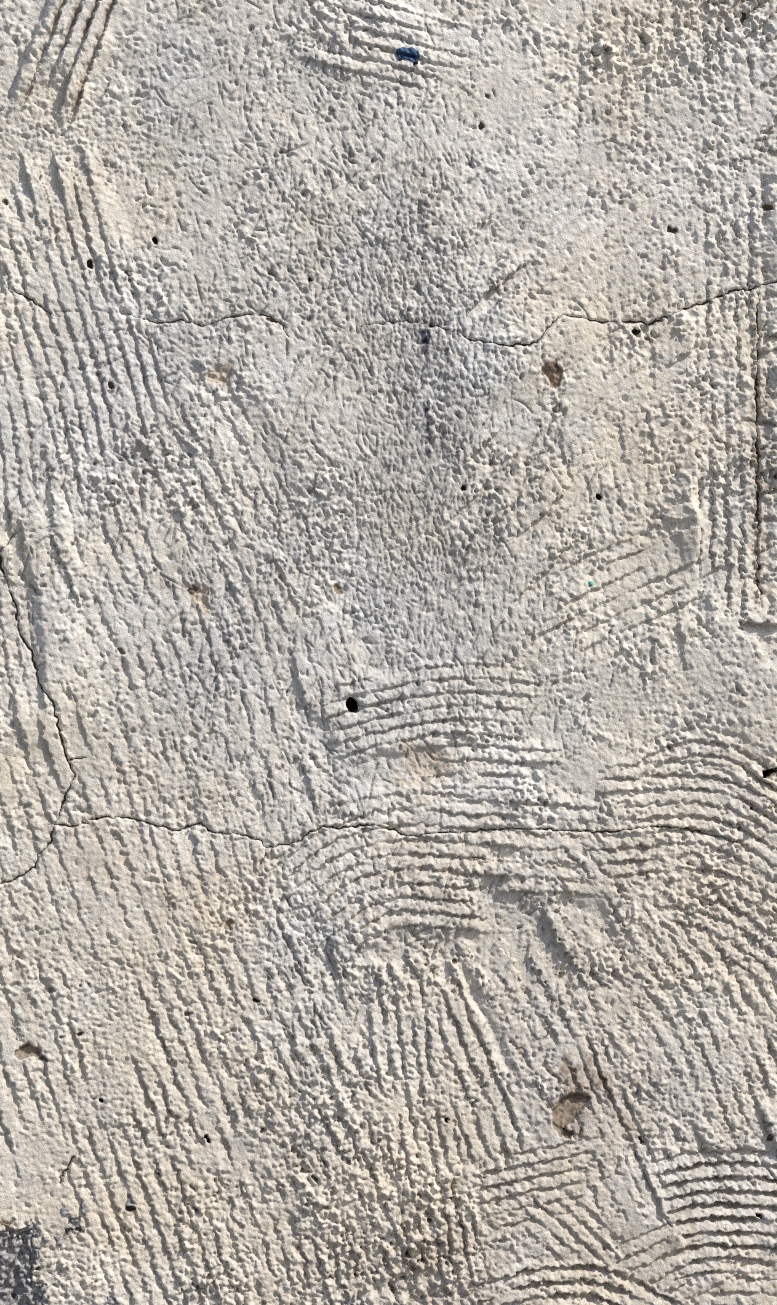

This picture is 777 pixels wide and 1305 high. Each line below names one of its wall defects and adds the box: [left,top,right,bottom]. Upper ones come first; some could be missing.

crack [12,289,56,316]
crack [130,314,290,338]
crack [362,281,777,606]
crack [0,534,738,884]
spalling [0,1203,90,1305]